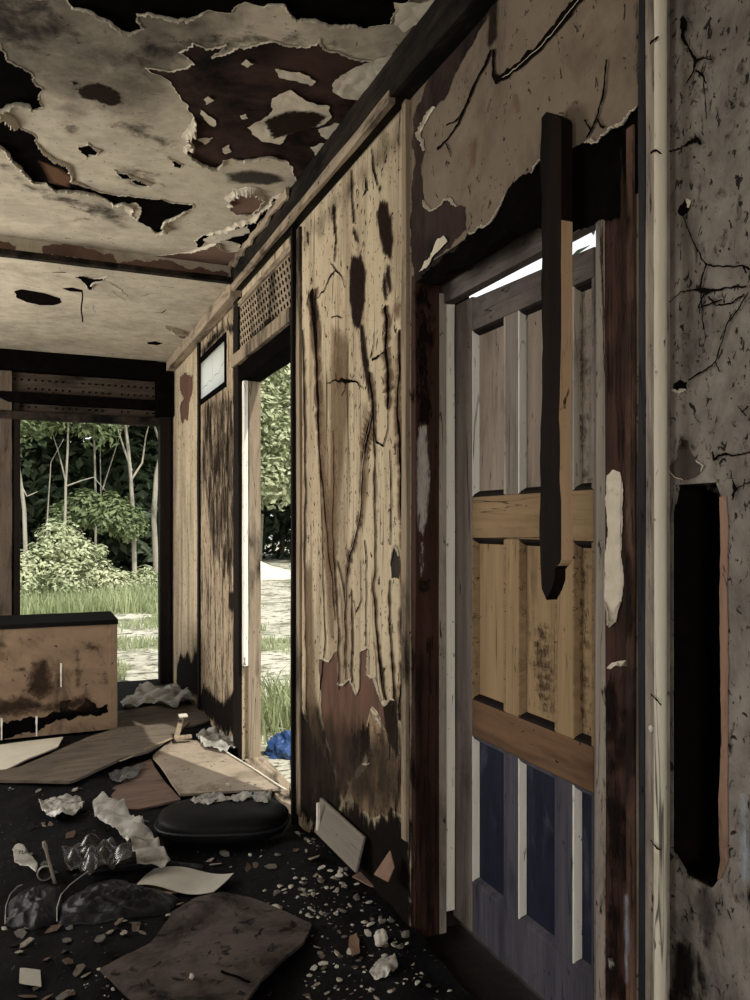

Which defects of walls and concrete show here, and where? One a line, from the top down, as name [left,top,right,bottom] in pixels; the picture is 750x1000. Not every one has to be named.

peeling [0,44,194,237]
peeling [66,0,434,37]
peeling [145,39,392,181]
crack [437,49,491,157]
peeling [410,14,542,284]
crack [584,59,607,138]
crack [650,16,712,154]
peeling [42,186,281,276]
damp [358,325,369,397]
crack [669,217,750,381]
damp [202,392,233,580]
damp [320,334,346,611]